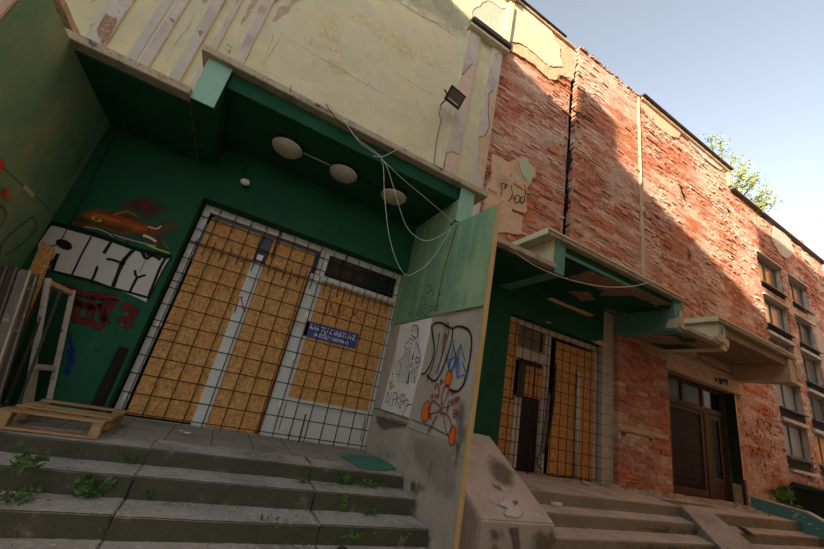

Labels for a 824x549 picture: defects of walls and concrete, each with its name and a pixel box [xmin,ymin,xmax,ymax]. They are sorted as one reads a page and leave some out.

spalling [91,4,126,45]
spalling [460,64,475,116]
flaking render [479,90,536,235]